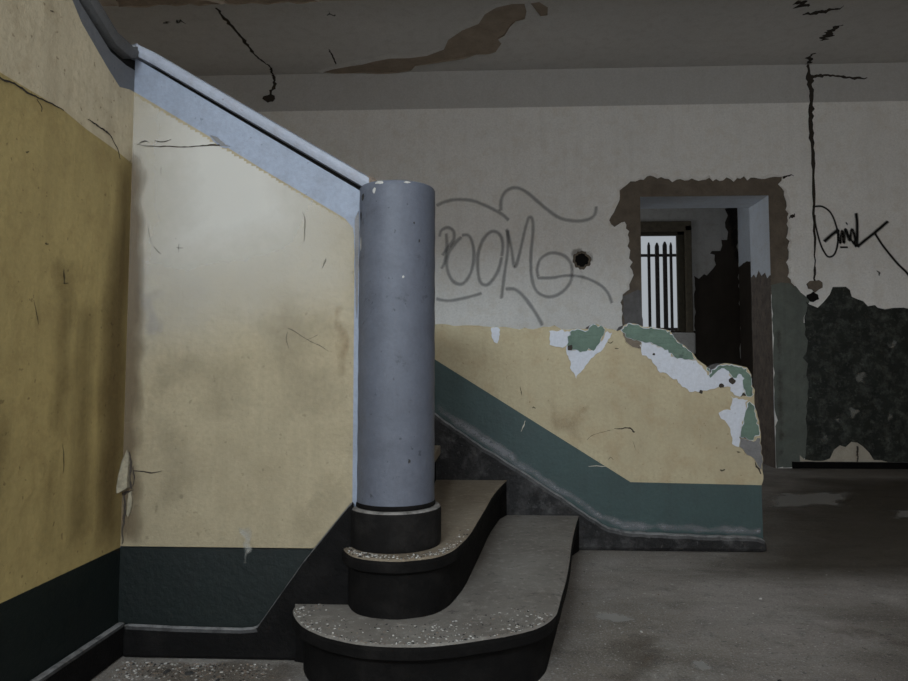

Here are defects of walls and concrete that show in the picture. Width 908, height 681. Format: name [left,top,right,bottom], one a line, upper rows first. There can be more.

crack [0,77,64,112]
crack [88,119,221,158]
crack [215,8,277,103]
peeling [317,0,554,74]
crack [792,0,868,302]
peeling [549,172,908,474]